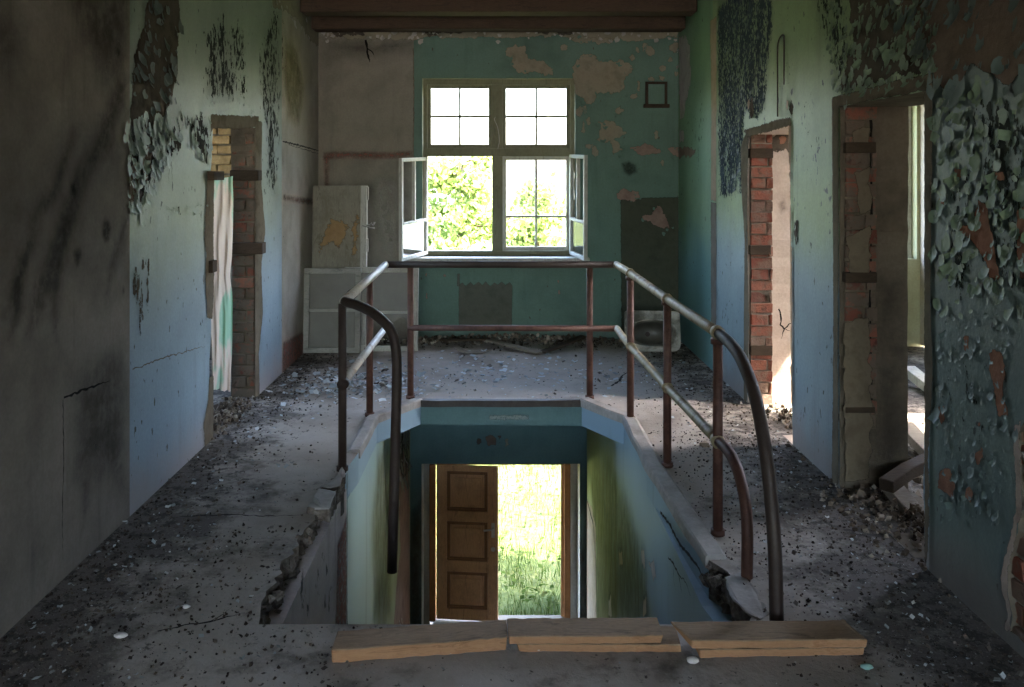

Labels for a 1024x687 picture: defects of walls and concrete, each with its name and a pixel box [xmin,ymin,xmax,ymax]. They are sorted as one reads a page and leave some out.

flaking render [321,32,679,166]
peeling [123,0,281,397]
peeling [641,206,674,236]
crack [62,381,108,547]
crack [133,347,203,370]
flaking render [204,376,214,446]
peeling [817,0,1024,641]
spalling [260,513,334,624]
crack [660,511,710,594]